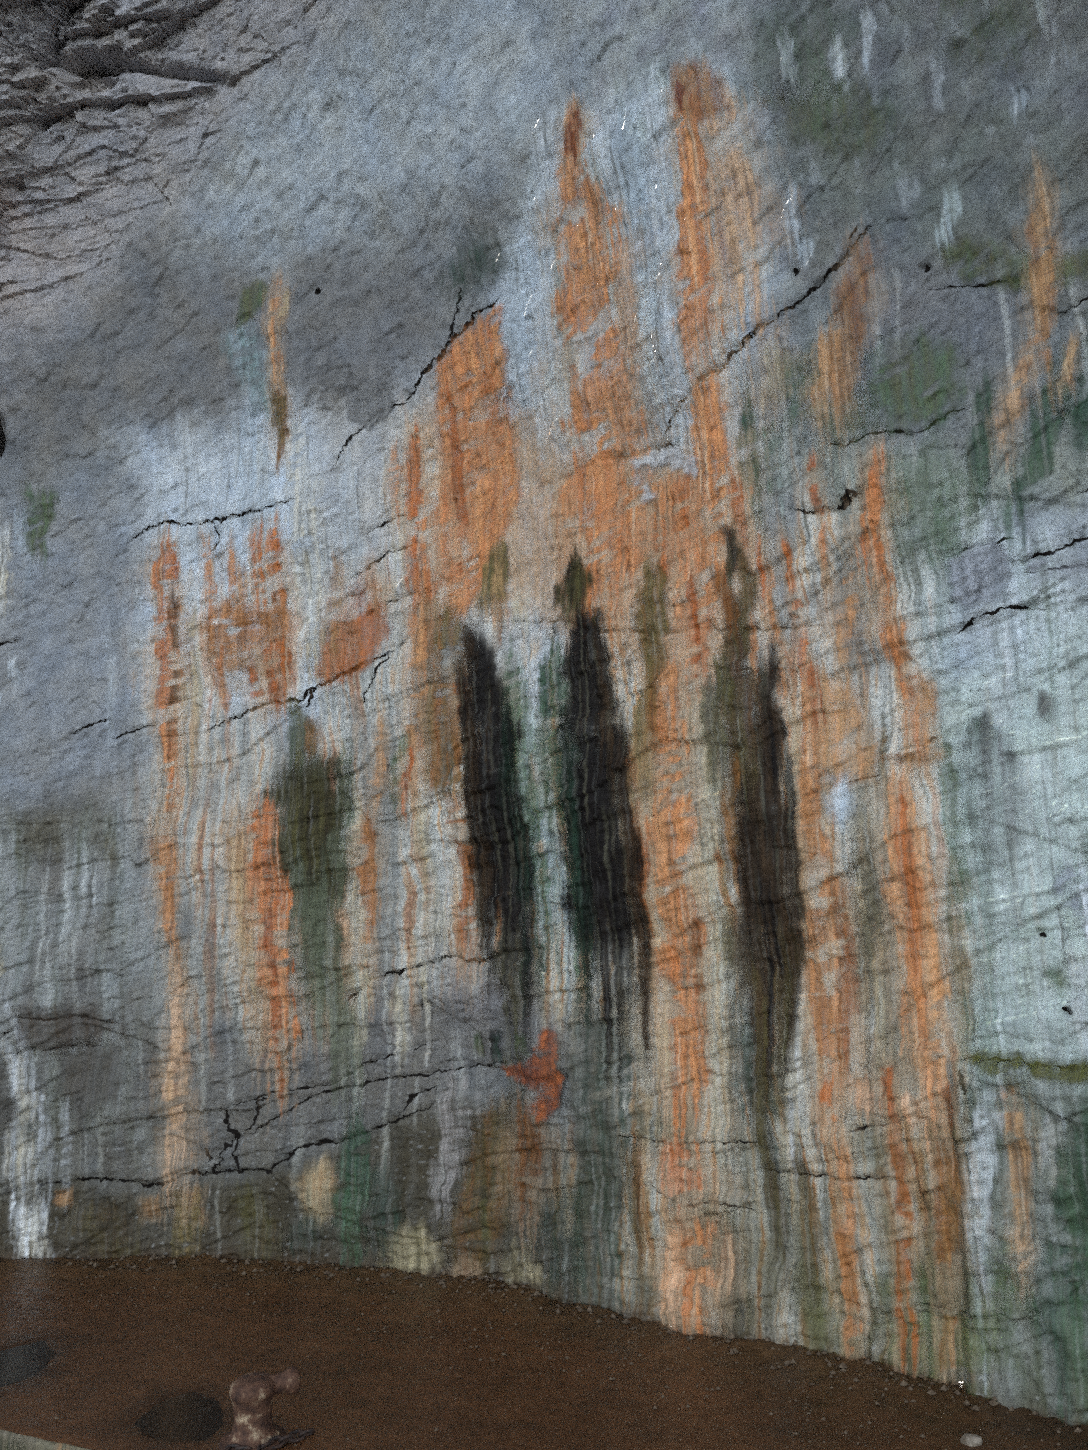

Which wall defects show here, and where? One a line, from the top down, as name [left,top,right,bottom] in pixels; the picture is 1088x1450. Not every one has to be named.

crack [127,497,297,550]
rust [149,515,294,813]
water stain [155,412,371,1089]
rust [265,281,289,468]
crack [209,637,405,730]
water stain [455,107,671,1307]
rust [336,64,962,1373]
crack [946,537,1088,634]
crack [0,951,521,1194]
rust [227,786,302,1114]
water stain [688,526,815,1294]
water stain [966,1110,1001,1283]